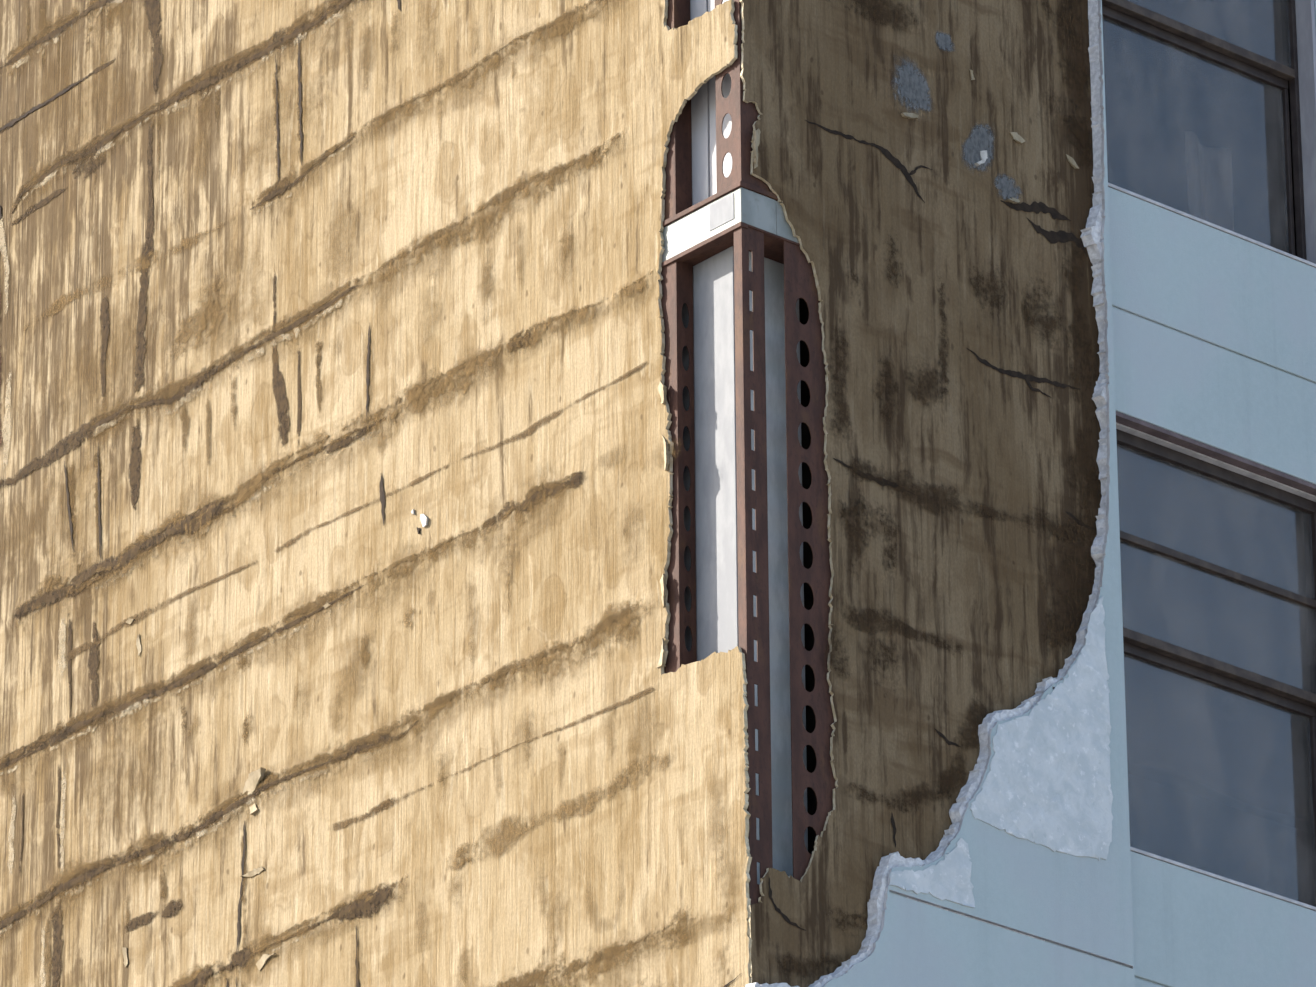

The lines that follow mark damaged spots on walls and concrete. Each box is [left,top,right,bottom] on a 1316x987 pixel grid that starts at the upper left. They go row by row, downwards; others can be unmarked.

peeling [752,129,761,168]
crack [805,120,933,203]
peeling [963,125,1021,204]
crack [1001,200,1087,257]
leakage [0,0,619,618]
crack [967,348,1081,397]
leakage [842,430,1100,648]
leakage [0,472,584,770]
leakage [0,602,691,987]
leakage [851,701,987,812]
peeling [970,596,1113,861]
peeling [889,838,975,908]